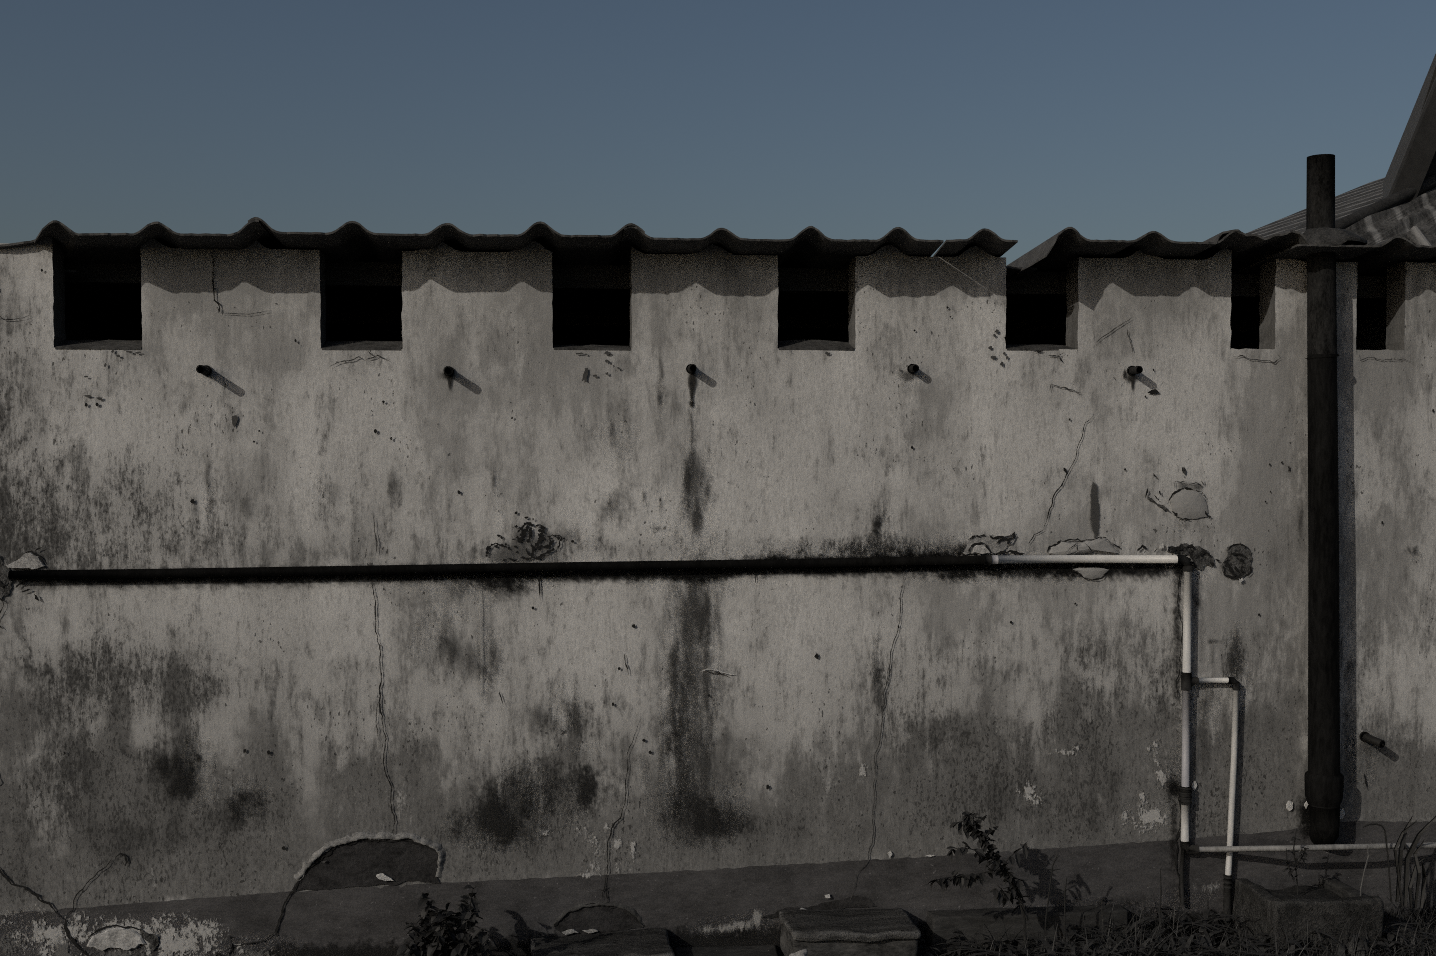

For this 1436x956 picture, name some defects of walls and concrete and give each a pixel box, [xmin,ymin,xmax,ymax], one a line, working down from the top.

crack [1098,319,1133,352]
damp [684,372,708,532]
crack [1029,350,1094,543]
spalling [485,511,574,563]
crack [372,516,396,835]
damp [19,513,1199,846]
crack [0,856,113,956]
peeling [0,905,274,956]
peeling [292,831,446,891]
damp [1166,779,1180,859]